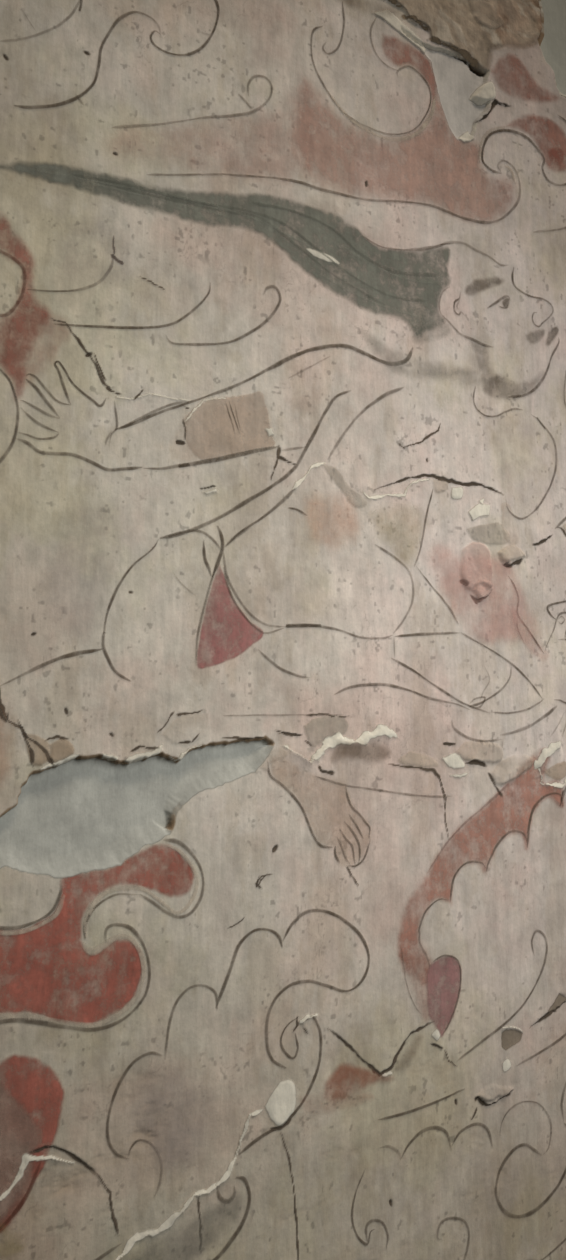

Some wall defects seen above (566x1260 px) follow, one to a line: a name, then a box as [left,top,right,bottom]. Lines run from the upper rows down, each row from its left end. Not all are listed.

crack [375,0,478,67]
crack [364,425,500,499]
crack [0,691,74,764]
flaking render [0,711,273,878]
crack [332,1023,456,1077]
crack [0,1146,219,1260]
spalling [216,1080,299,1260]